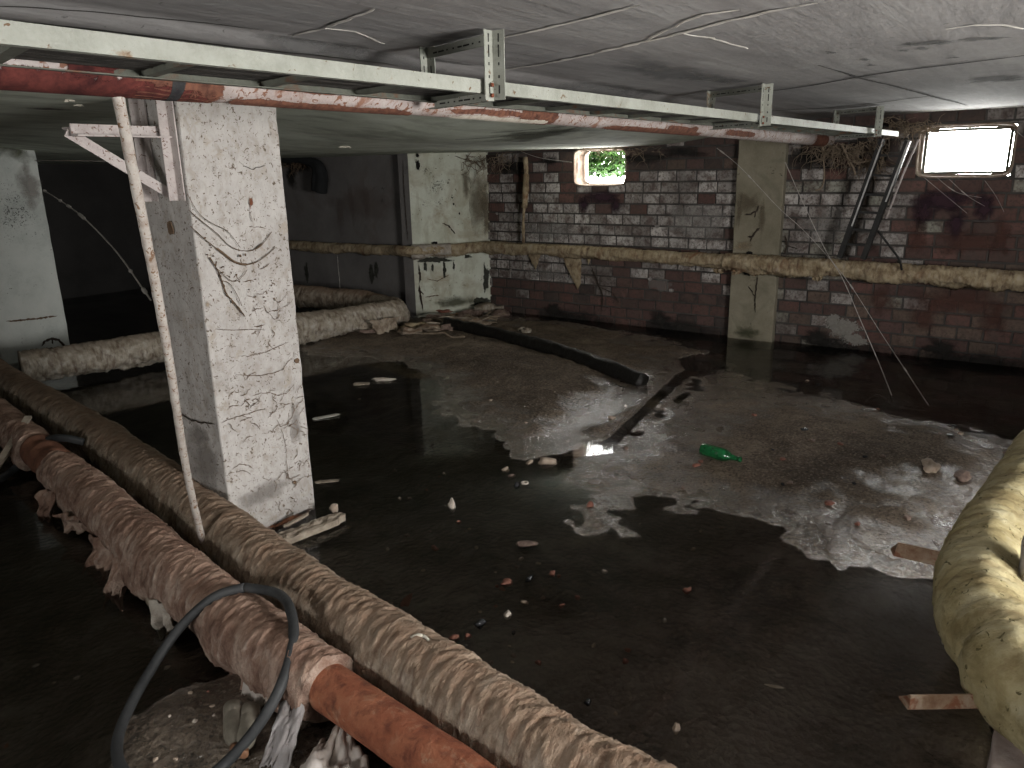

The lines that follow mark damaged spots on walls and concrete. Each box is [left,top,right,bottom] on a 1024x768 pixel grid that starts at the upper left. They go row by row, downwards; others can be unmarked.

crack [0,6,398,66]
crack [504,3,818,70]
rust [0,64,413,116]
rust [451,109,559,125]
rust [602,125,701,136]
water stain [406,153,489,227]
crack [745,206,760,242]
water stain [913,191,994,236]
water stain [418,255,472,278]
water stain [438,262,490,306]
crack [748,275,758,312]
crack [182,265,312,513]